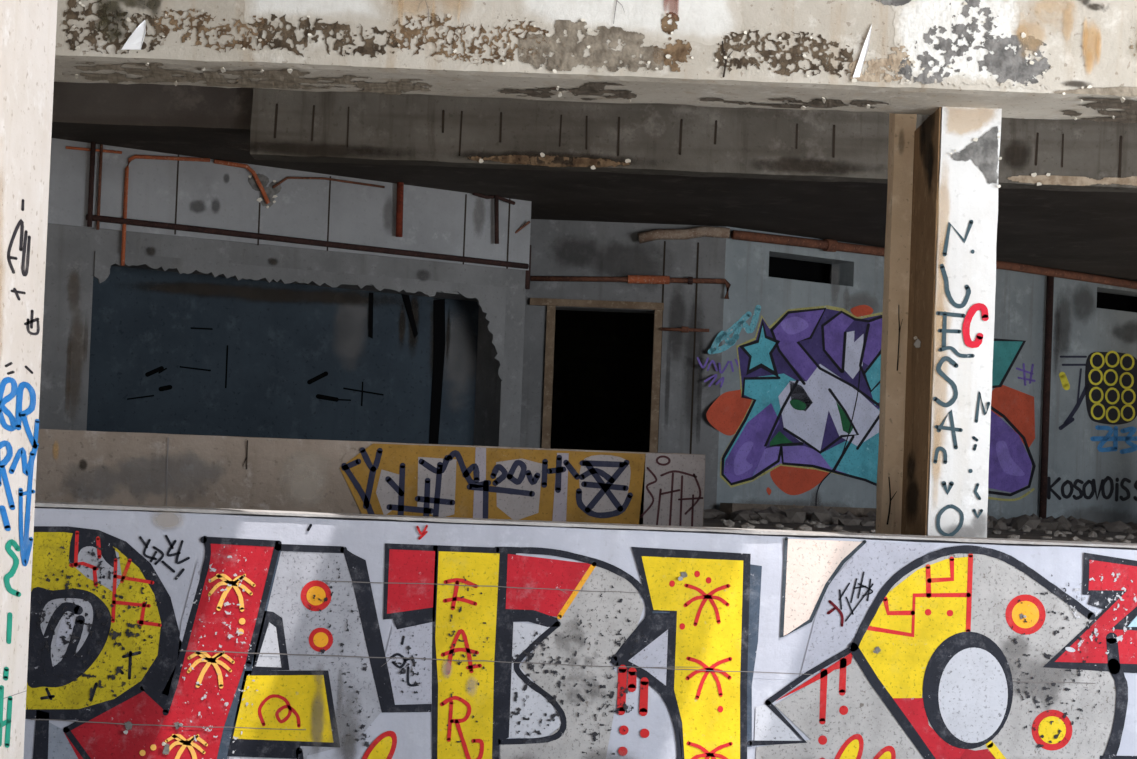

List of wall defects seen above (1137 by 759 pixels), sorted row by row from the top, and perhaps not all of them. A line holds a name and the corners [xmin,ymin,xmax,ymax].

water stain [98,0,161,41]
spalling [62,0,694,102]
spalling [715,0,1053,86]
peeling [700,97,889,110]
peeling [1054,85,1137,123]
spalling [950,127,1137,188]